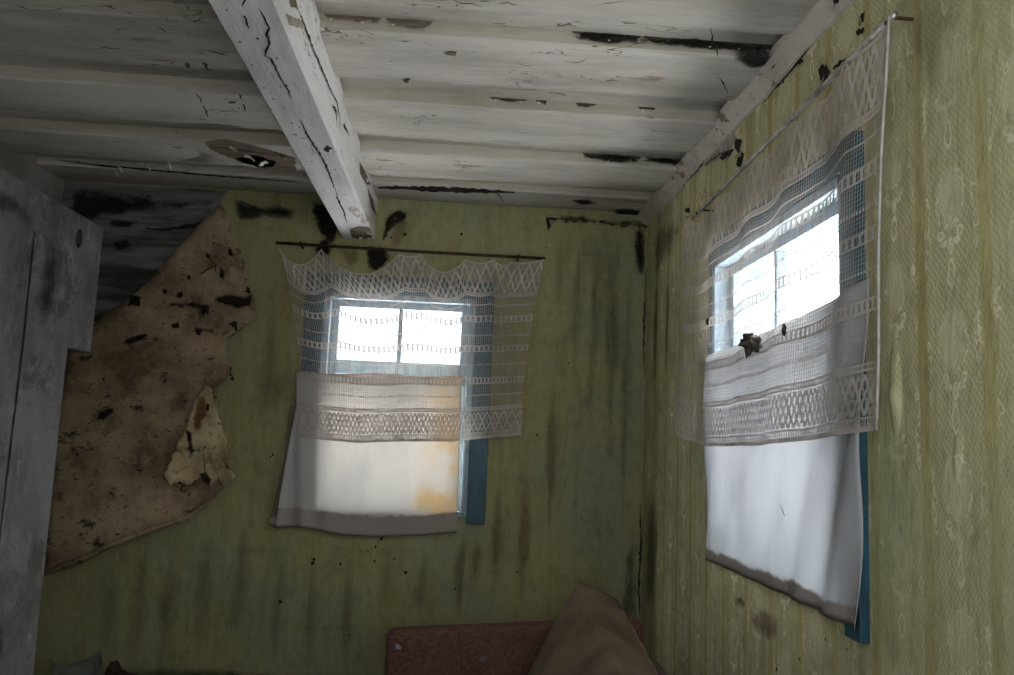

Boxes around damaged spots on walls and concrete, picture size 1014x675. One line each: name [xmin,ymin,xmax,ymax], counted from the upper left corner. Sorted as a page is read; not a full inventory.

peeling [286,0,303,29]
peeling [324,14,433,30]
peeling [572,31,774,51]
peeling [490,97,547,105]
peeling [204,139,313,171]
peeling [583,153,681,165]
peeling [359,162,377,216]
leakage [236,203,292,219]
leakage [313,204,338,256]
peeling [350,226,374,240]
leakage [367,210,406,270]